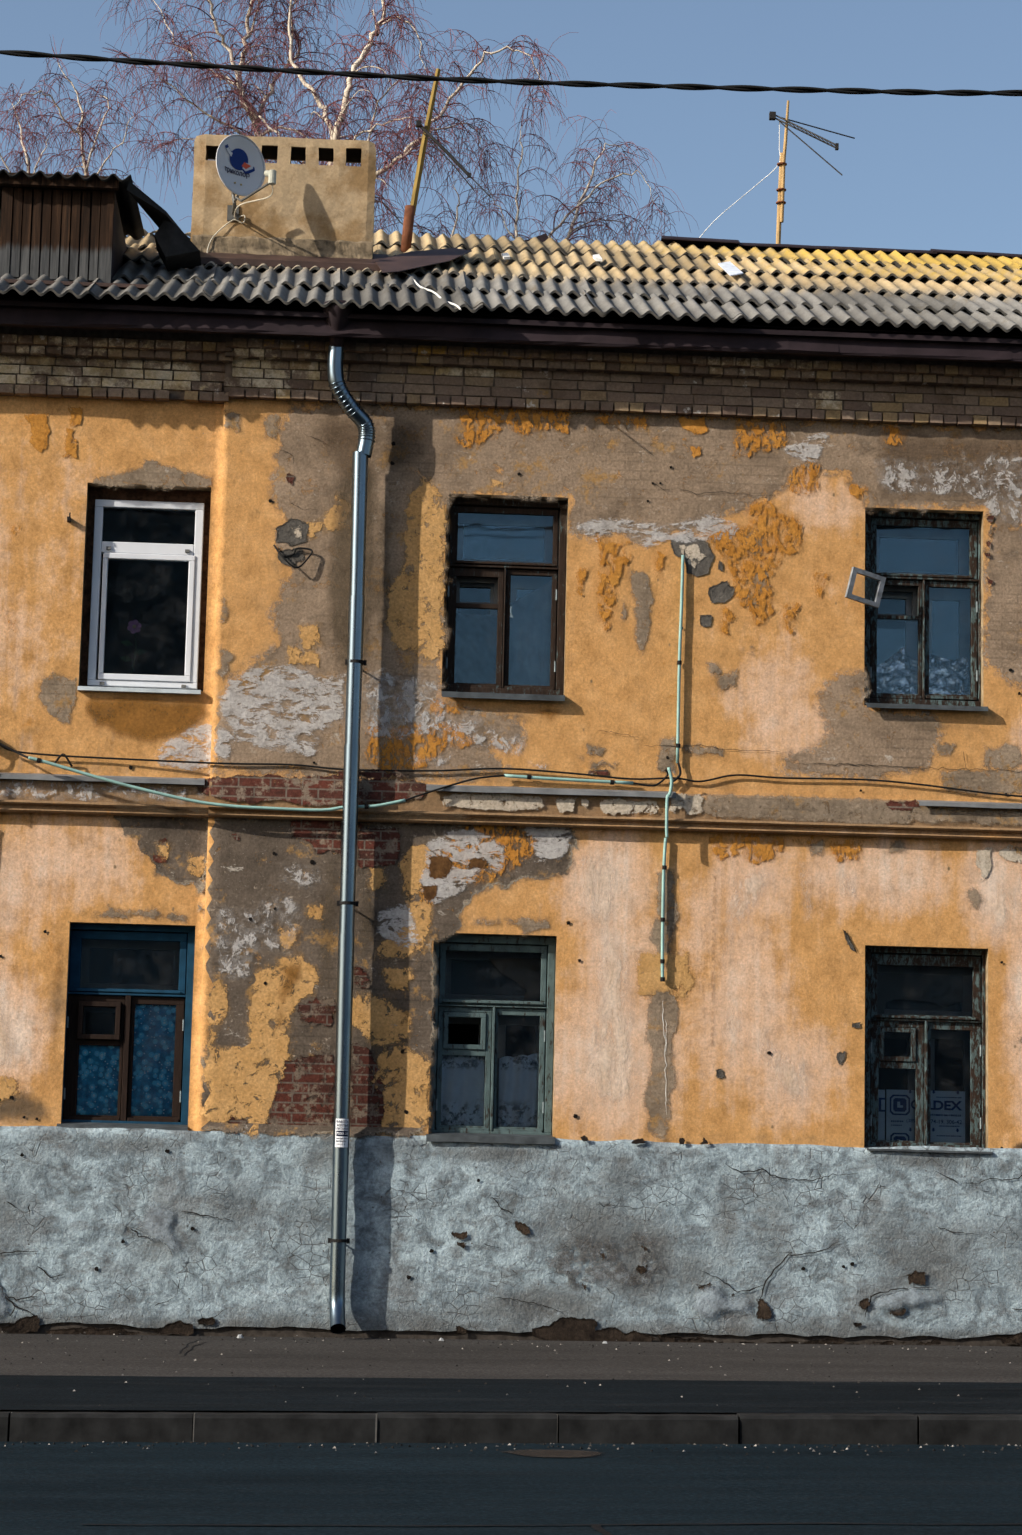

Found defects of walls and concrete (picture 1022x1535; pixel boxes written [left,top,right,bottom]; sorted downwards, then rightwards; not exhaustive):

peeling [93,400,1022,1141]
crack [934,1170,1022,1192]
crack [865,1287,932,1317]